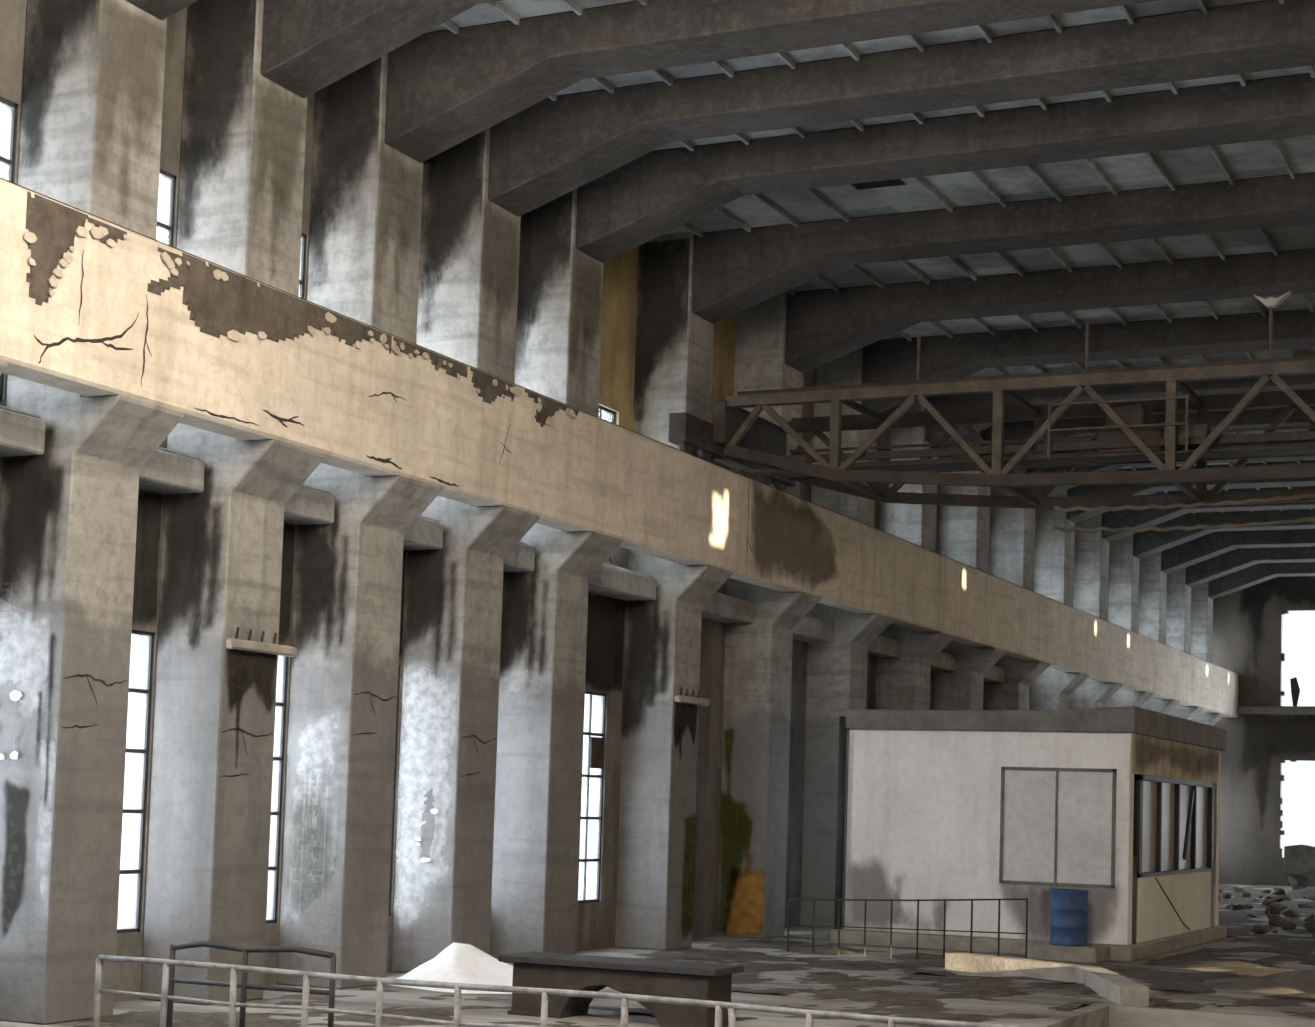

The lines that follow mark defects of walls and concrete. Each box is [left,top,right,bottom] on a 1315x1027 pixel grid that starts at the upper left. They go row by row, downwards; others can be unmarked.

leakage [23,73,46,165]
spalling [24,191,128,306]
leakage [178,147,205,240]
crack [34,250,152,387]
spalling [147,247,579,427]
leakage [516,301,530,360]
leakage [143,496,162,615]
leakage [191,467,221,646]
leakage [279,528,294,631]
leakage [753,488,836,587]